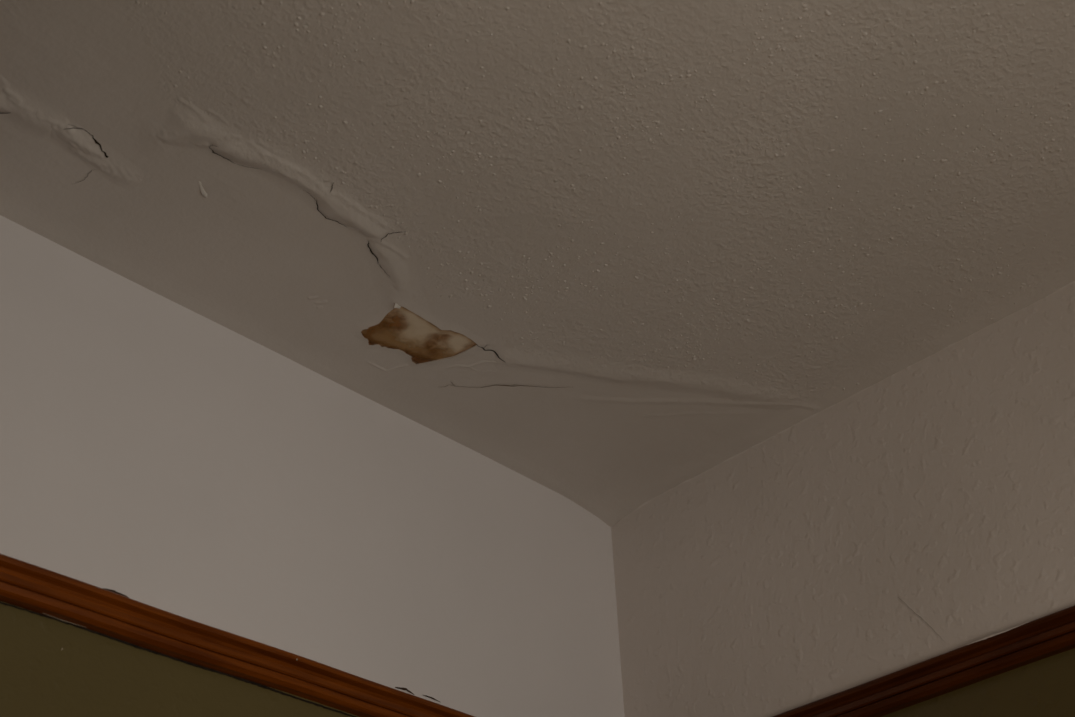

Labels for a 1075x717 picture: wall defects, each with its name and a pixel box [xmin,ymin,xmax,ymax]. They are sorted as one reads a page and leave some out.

crack [64,124,109,183]
leakage [363,315,448,364]
crack [445,345,564,388]